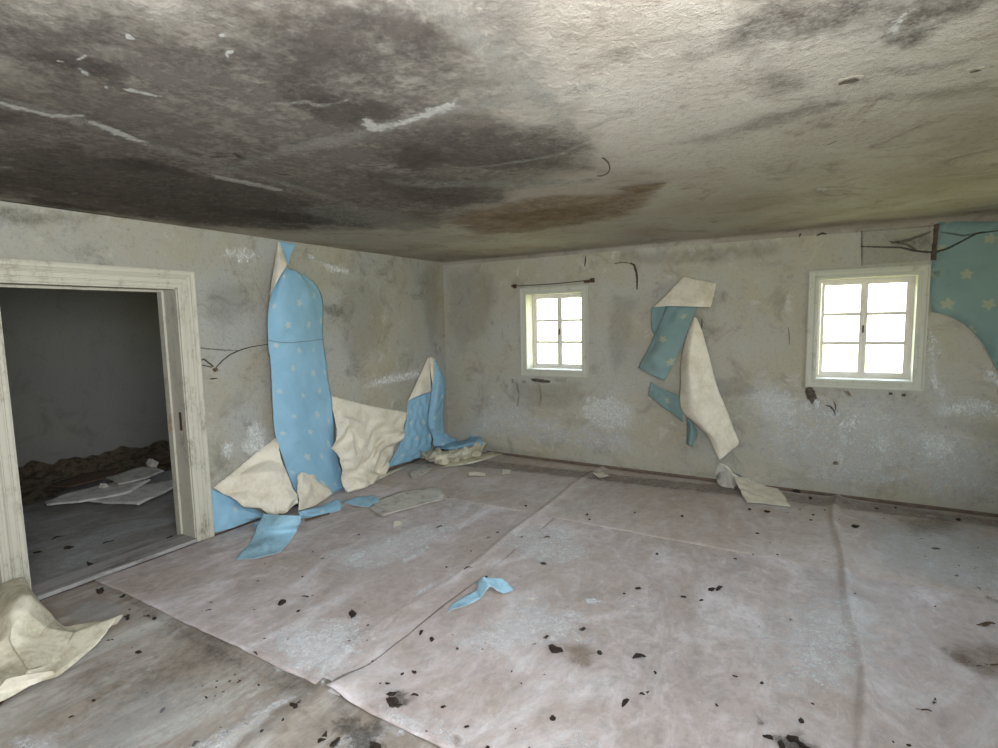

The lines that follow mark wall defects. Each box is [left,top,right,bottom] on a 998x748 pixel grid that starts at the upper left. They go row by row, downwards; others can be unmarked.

water stain [734,0,984,43]
water stain [0,0,588,229]
peeling [211,423,341,533]